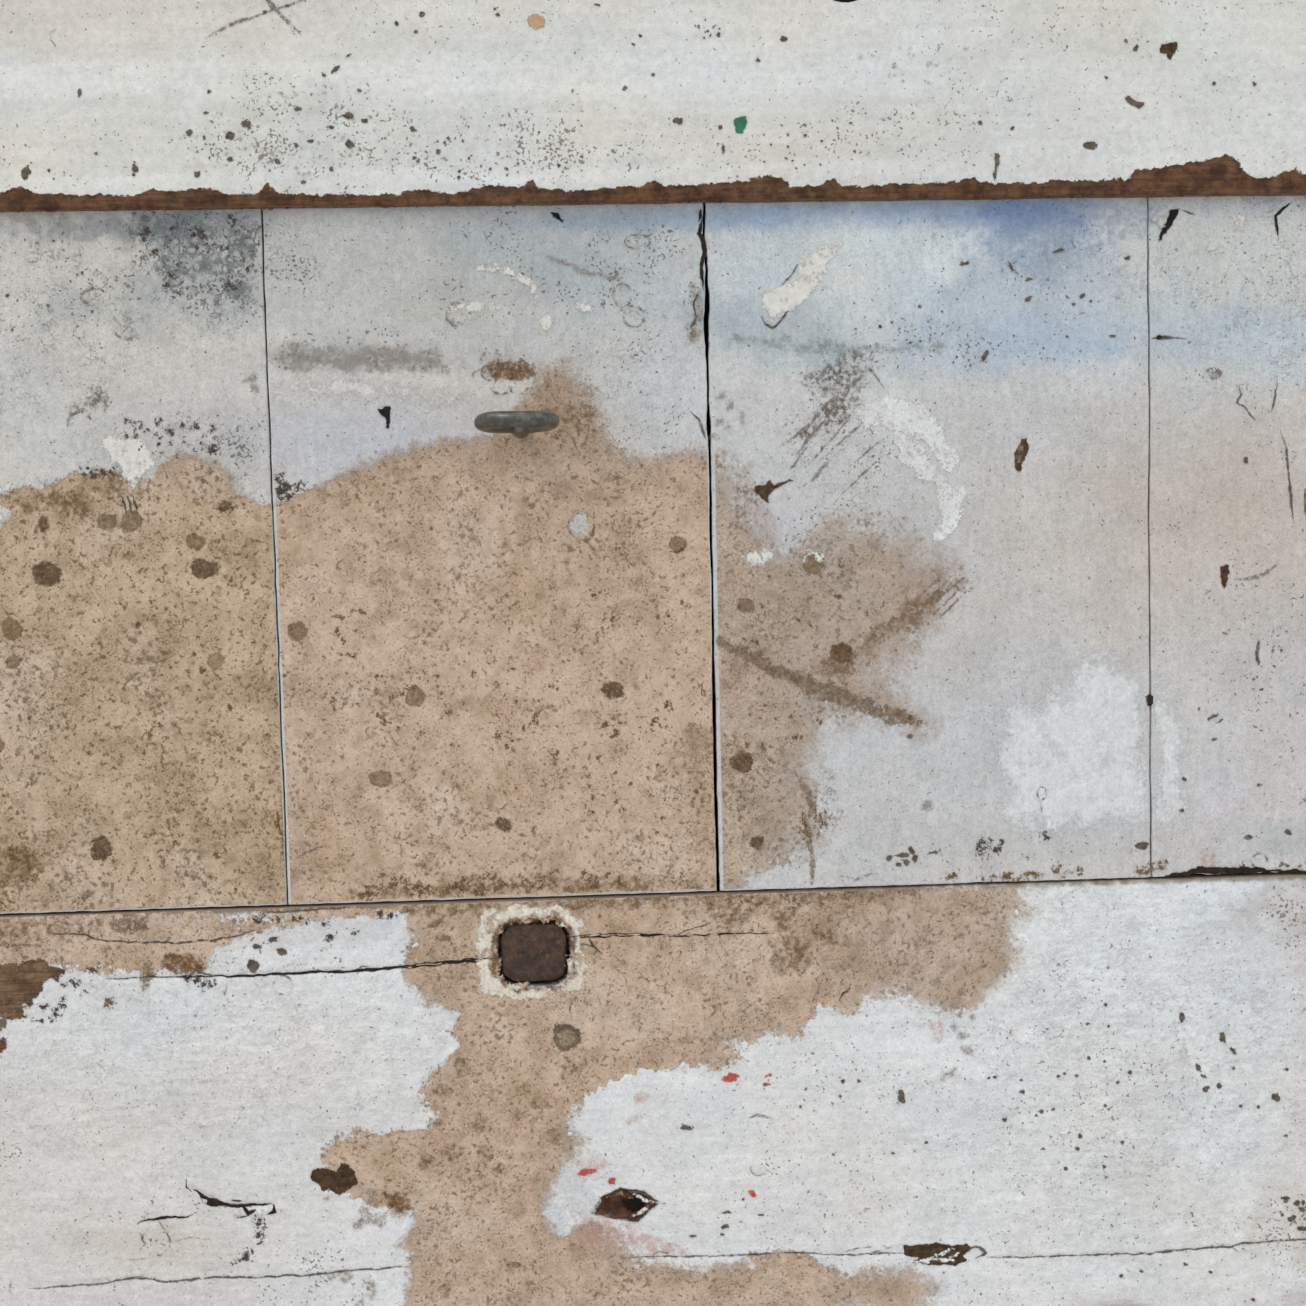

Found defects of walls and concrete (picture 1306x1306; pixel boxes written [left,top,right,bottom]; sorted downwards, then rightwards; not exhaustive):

corrosion [491,916,577,994]
crack [623,1247,894,1259]
crack [992,1238,1306,1259]